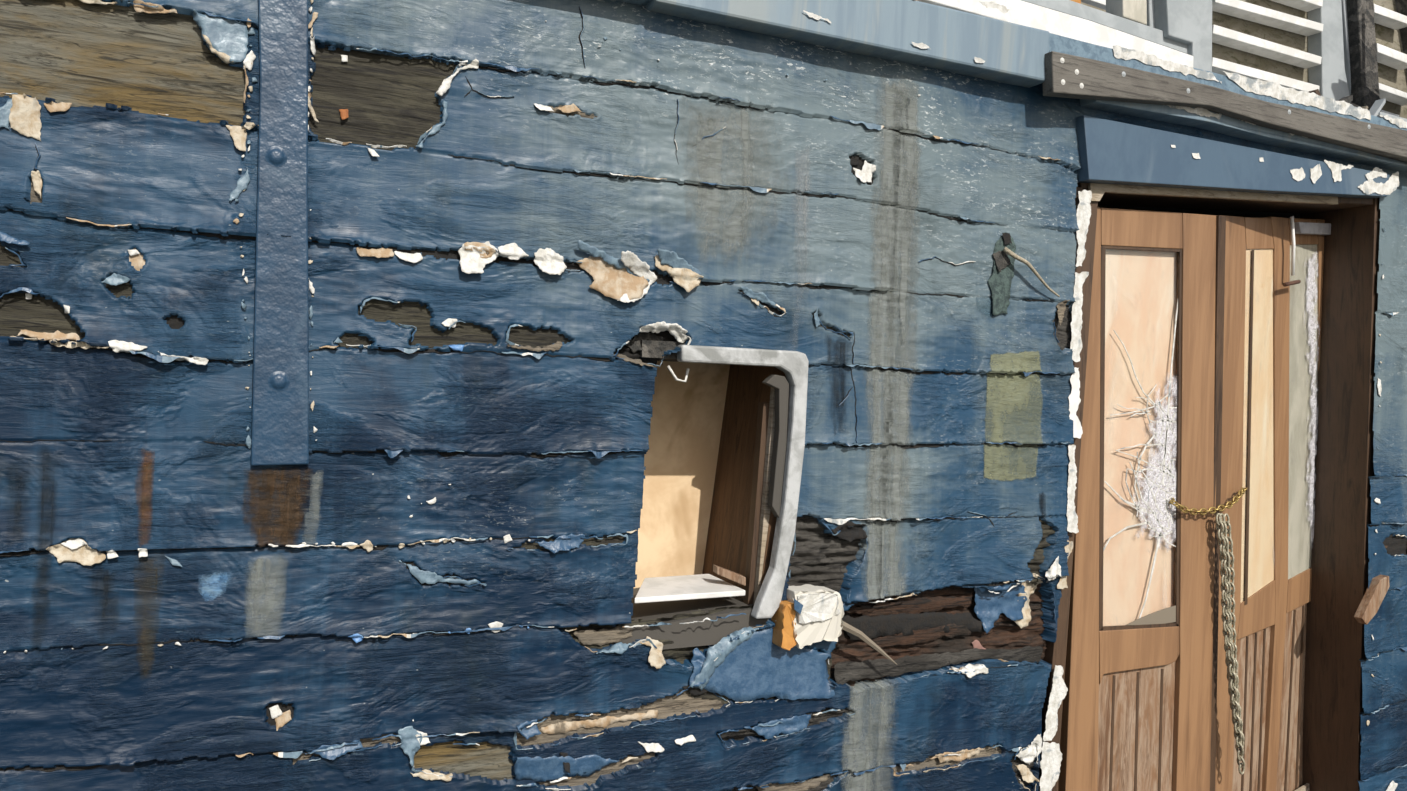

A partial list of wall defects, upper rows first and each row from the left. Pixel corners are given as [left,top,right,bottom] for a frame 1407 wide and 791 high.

peeling [0,0,258,224]
peeling [308,0,479,157]
peeling [0,231,30,267]
peeling [102,248,145,298]
peeling [0,287,209,365]
rust [140,453,152,526]
rust [248,468,309,547]
peeling [293,190,1092,791]